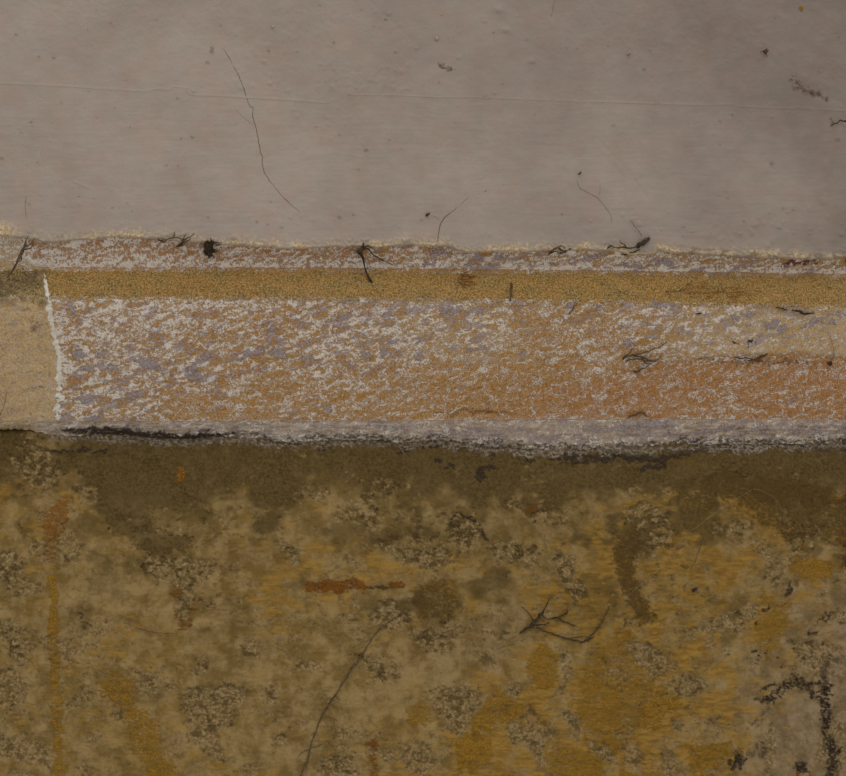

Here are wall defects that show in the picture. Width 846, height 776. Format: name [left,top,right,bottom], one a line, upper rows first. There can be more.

crack [223,49,299,211]